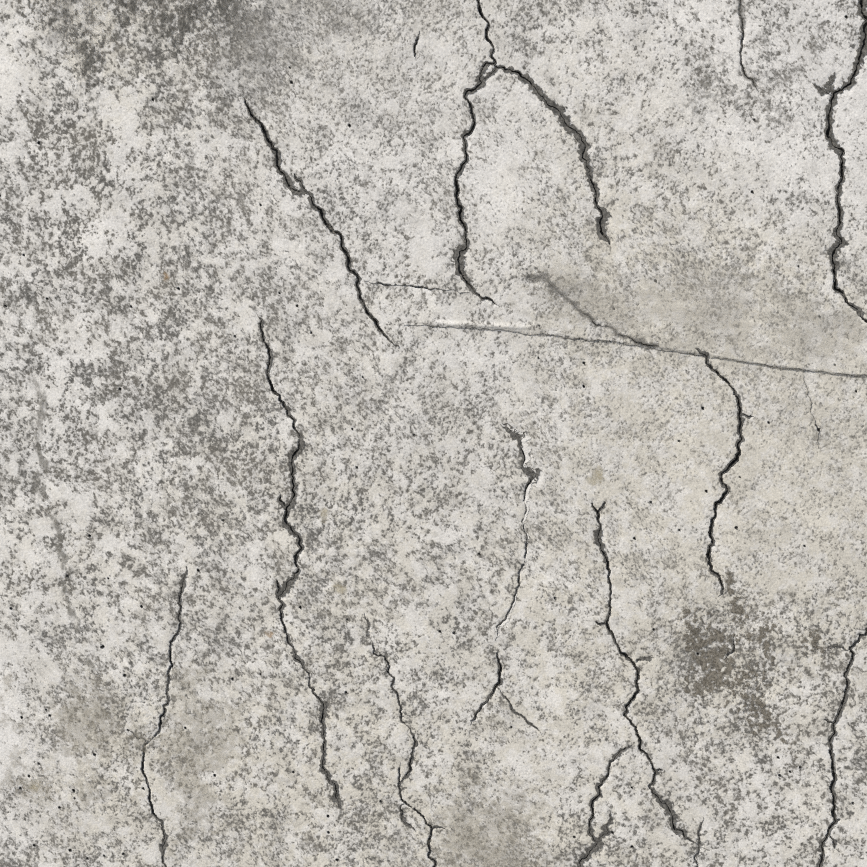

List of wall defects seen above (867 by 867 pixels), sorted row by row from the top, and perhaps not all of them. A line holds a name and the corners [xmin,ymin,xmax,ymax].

crack [244,99,400,349]
crack [452,0,612,305]
crack [523,274,658,348]
crack [737,0,757,88]
crack [814,0,867,322]
crack [132,566,188,867]
crack [259,317,341,808]
crack [364,615,443,867]
crack [471,423,541,733]
crack [576,502,705,867]
crack [695,348,751,595]
crack [816,630,867,867]